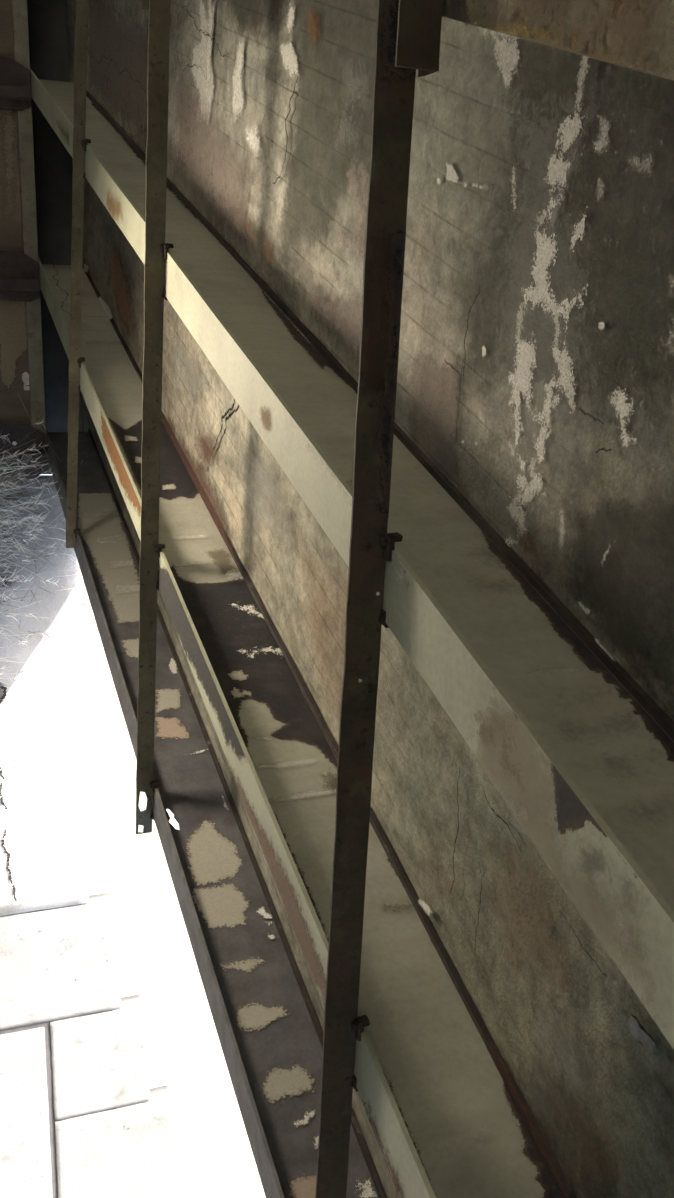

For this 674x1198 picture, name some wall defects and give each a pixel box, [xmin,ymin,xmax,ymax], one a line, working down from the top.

leakage [192,0,298,124]
leakage [247,127,260,156]
leakage [504,56,617,547]
crack [214,399,235,449]
leakage [608,388,643,448]
peeling [158,565,283,760]
crack [449,767,522,950]